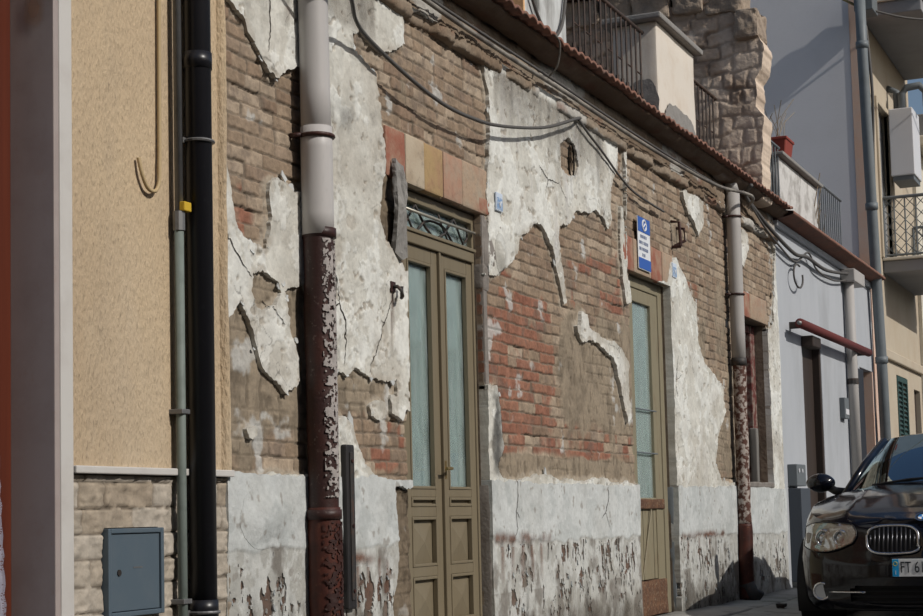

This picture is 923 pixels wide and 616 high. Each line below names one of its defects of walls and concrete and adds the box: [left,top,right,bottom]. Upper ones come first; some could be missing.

flaking render [224,0,301,254]
flaking render [353,20,488,170]
flaking render [560,139,579,183]
flaking render [229,272,308,475]
flaking render [322,238,412,616]
flaking render [380,150,736,484]
flaking render [741,225,774,331]
peeling [240,568,299,616]
peeling [509,544,532,616]
peeling [550,539,634,616]